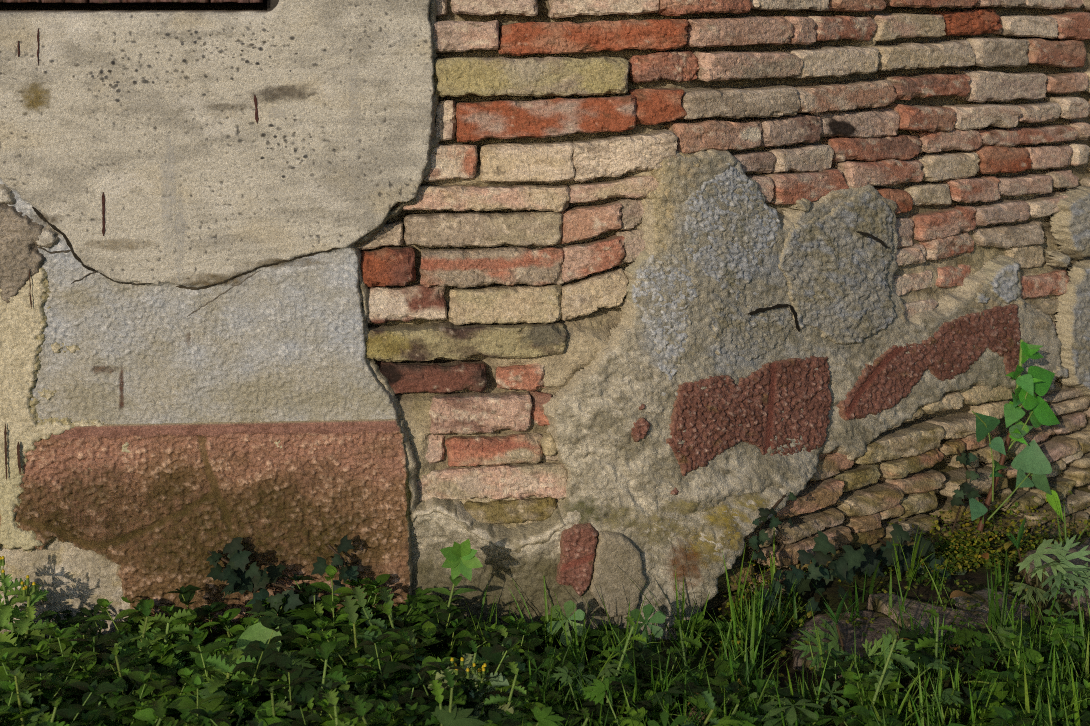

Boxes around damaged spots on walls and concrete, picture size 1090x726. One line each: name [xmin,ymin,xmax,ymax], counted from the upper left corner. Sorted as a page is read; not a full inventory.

spalling [429,0,437,61]
spalling [424,76,440,178]
flaking render [0,184,16,205]
flaking render [36,225,60,249]
spalling [352,196,419,247]
spalling [359,260,369,340]
crack [748,304,800,332]
flaking render [624,151,1021,476]
flaking render [1045,185,1090,398]
corrosion [4,424,21,480]
spalling [366,358,598,597]
spalling [0,537,130,651]